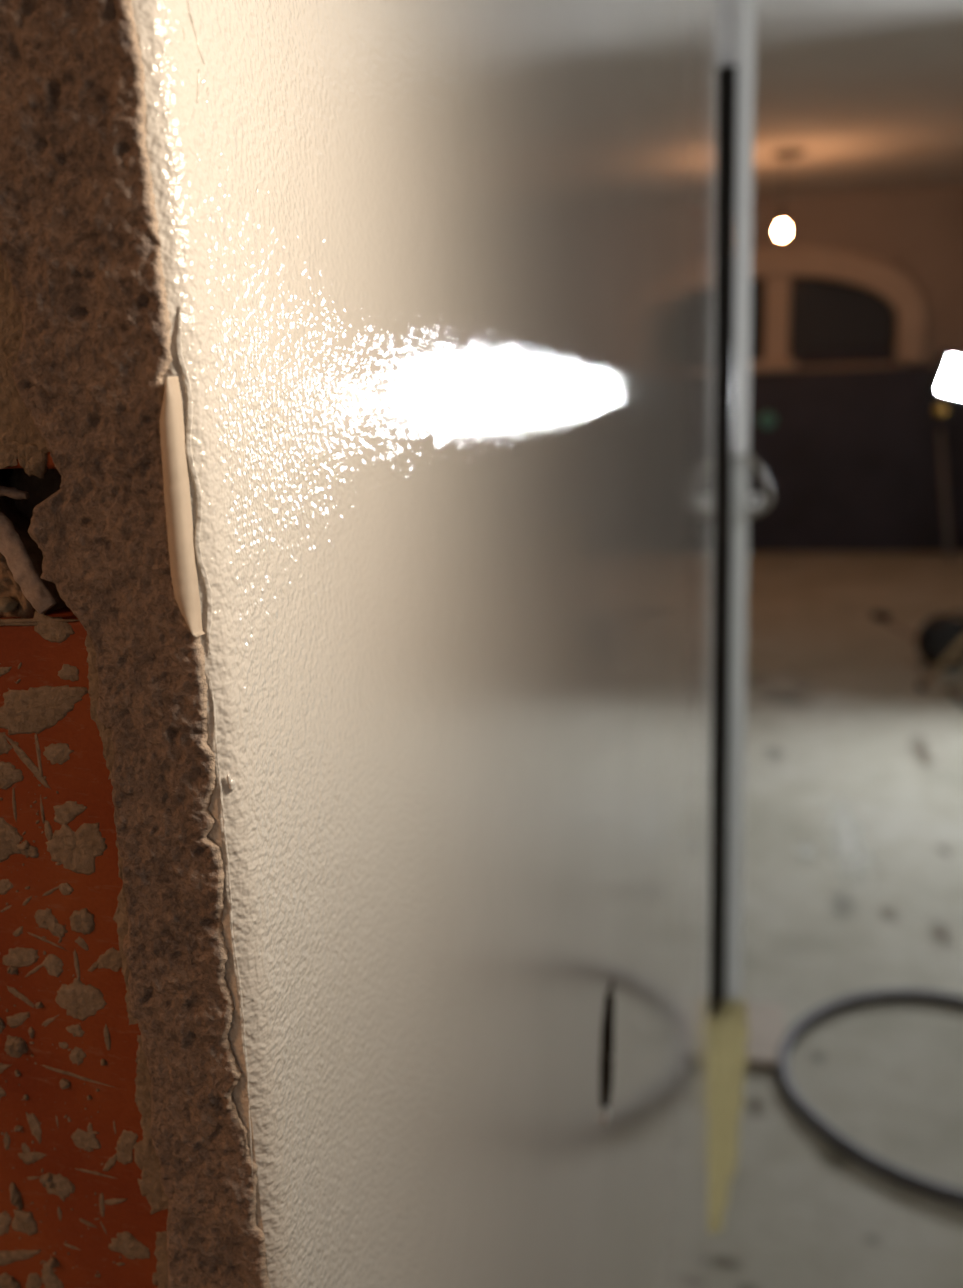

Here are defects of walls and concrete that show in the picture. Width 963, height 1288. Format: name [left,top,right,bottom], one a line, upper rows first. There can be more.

flaking render [0,0,271,1288]